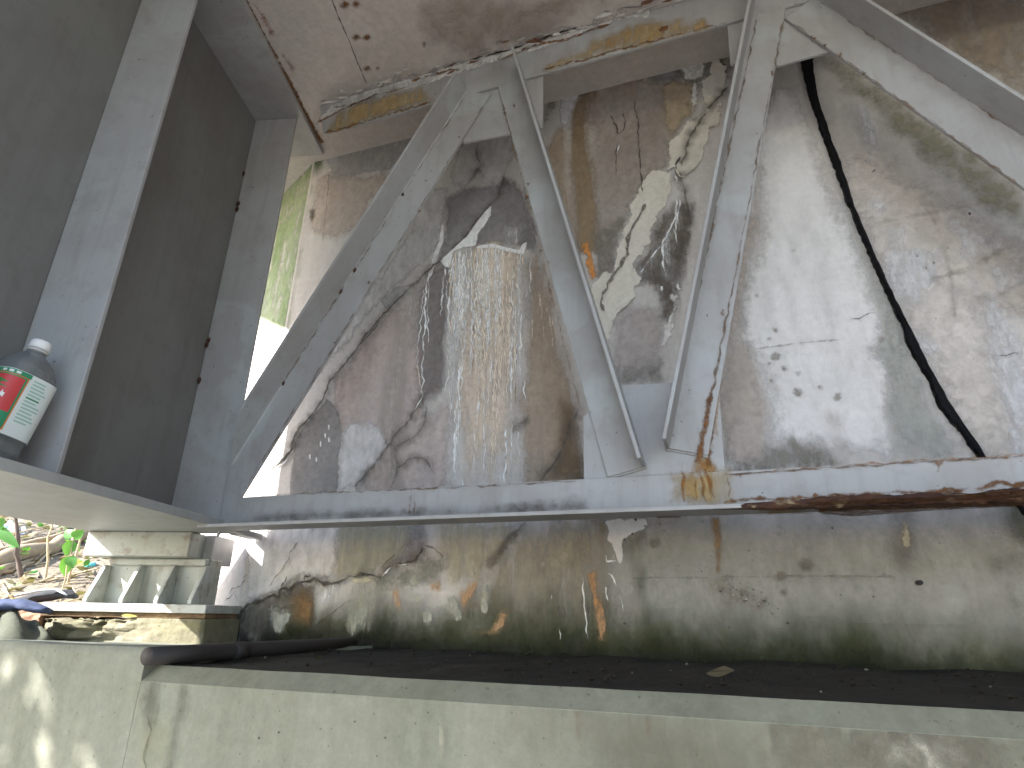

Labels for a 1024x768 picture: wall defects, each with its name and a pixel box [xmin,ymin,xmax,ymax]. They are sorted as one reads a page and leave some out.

peeling [316,0,682,125]
peeling [590,58,727,349]
damp [335,181,582,491]
rust [681,252,1024,516]
crack [226,543,443,631]
damp [236,506,1024,671]
peeling [605,518,665,564]